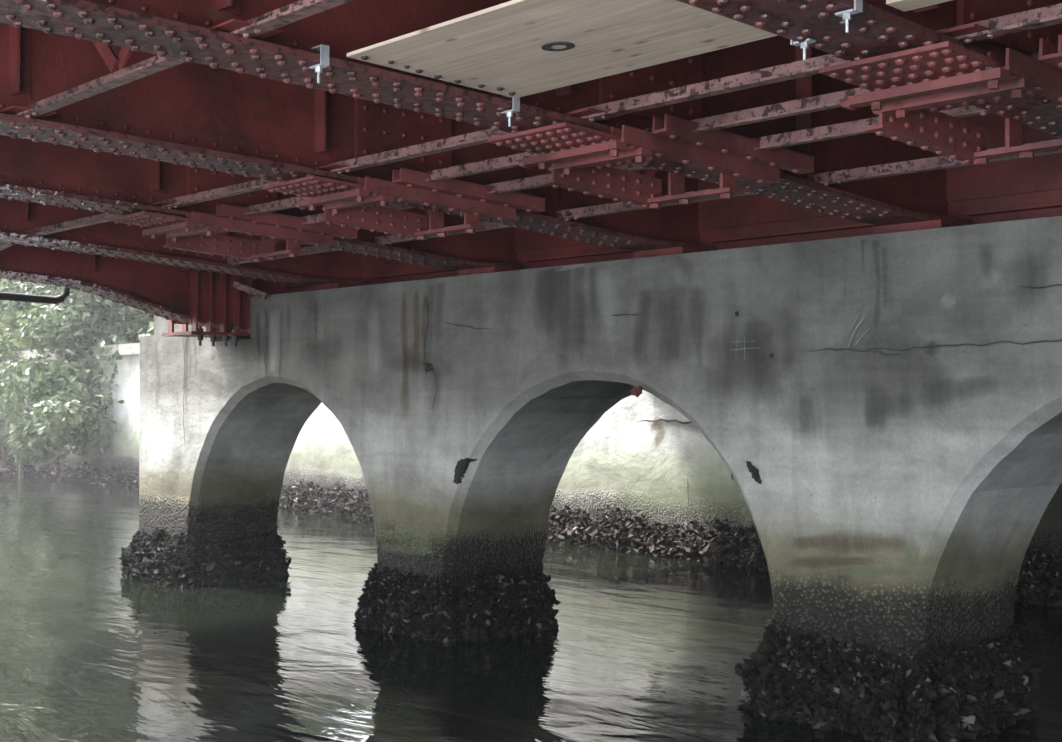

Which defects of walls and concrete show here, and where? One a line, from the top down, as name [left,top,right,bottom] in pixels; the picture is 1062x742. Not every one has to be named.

crack [1021,282,1062,290]
crack [815,339,1062,356]
spalling [746,461,762,484]